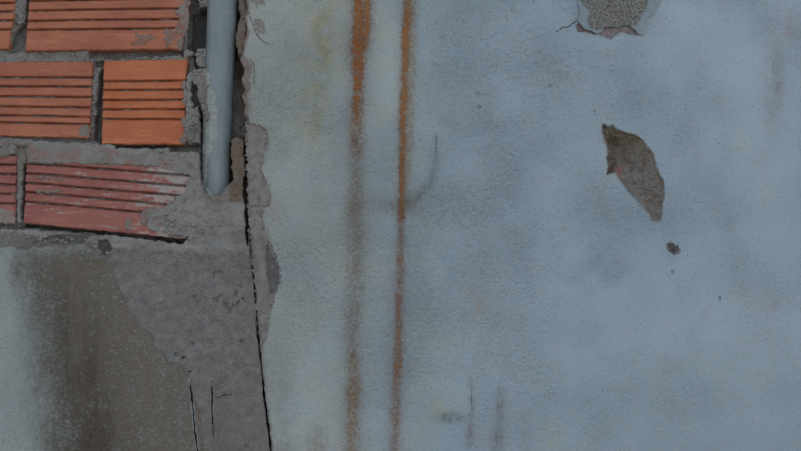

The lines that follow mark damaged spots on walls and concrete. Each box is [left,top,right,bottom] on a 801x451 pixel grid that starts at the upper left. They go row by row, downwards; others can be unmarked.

rust [351,0,371,140]
flaking render [575,0,661,40]
rust [394,0,412,438]
spalling [601,123,665,222]
spalling [666,242,681,255]
leakage [35,251,201,451]
crack [187,372,230,451]
crack [248,234,272,451]